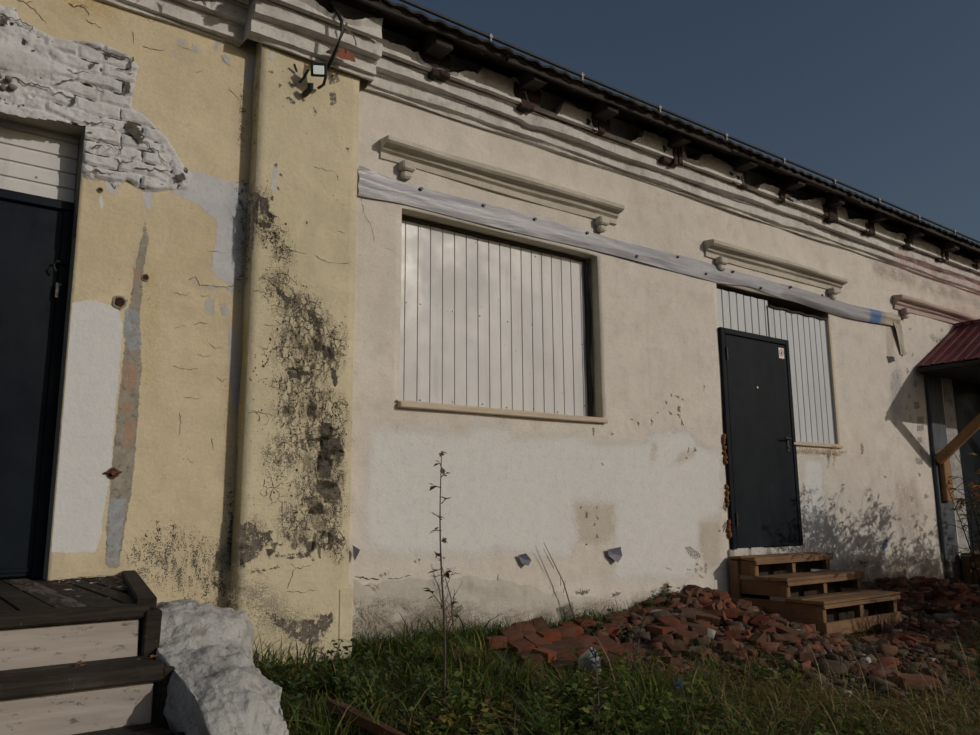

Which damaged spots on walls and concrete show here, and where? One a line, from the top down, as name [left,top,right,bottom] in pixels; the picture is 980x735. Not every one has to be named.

flaking render [0,5,248,417]
peeling [51,296,142,565]
leakage [126,435,329,659]